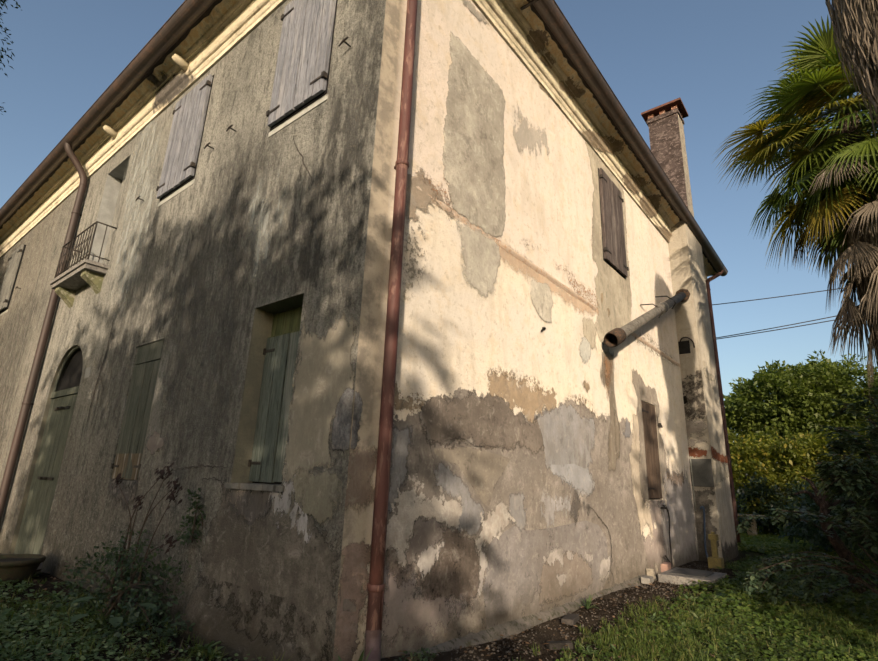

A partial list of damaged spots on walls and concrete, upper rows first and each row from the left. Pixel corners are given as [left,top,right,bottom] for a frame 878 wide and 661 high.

water stain [91,0,382,465]
flaking render [405,32,550,297]
flaking render [530,280,553,332]
water stain [225,481,285,530]
flaking render [198,474,371,661]
flaking render [331,388,363,452]
water stain [381,569,473,645]
flaking render [381,369,659,658]